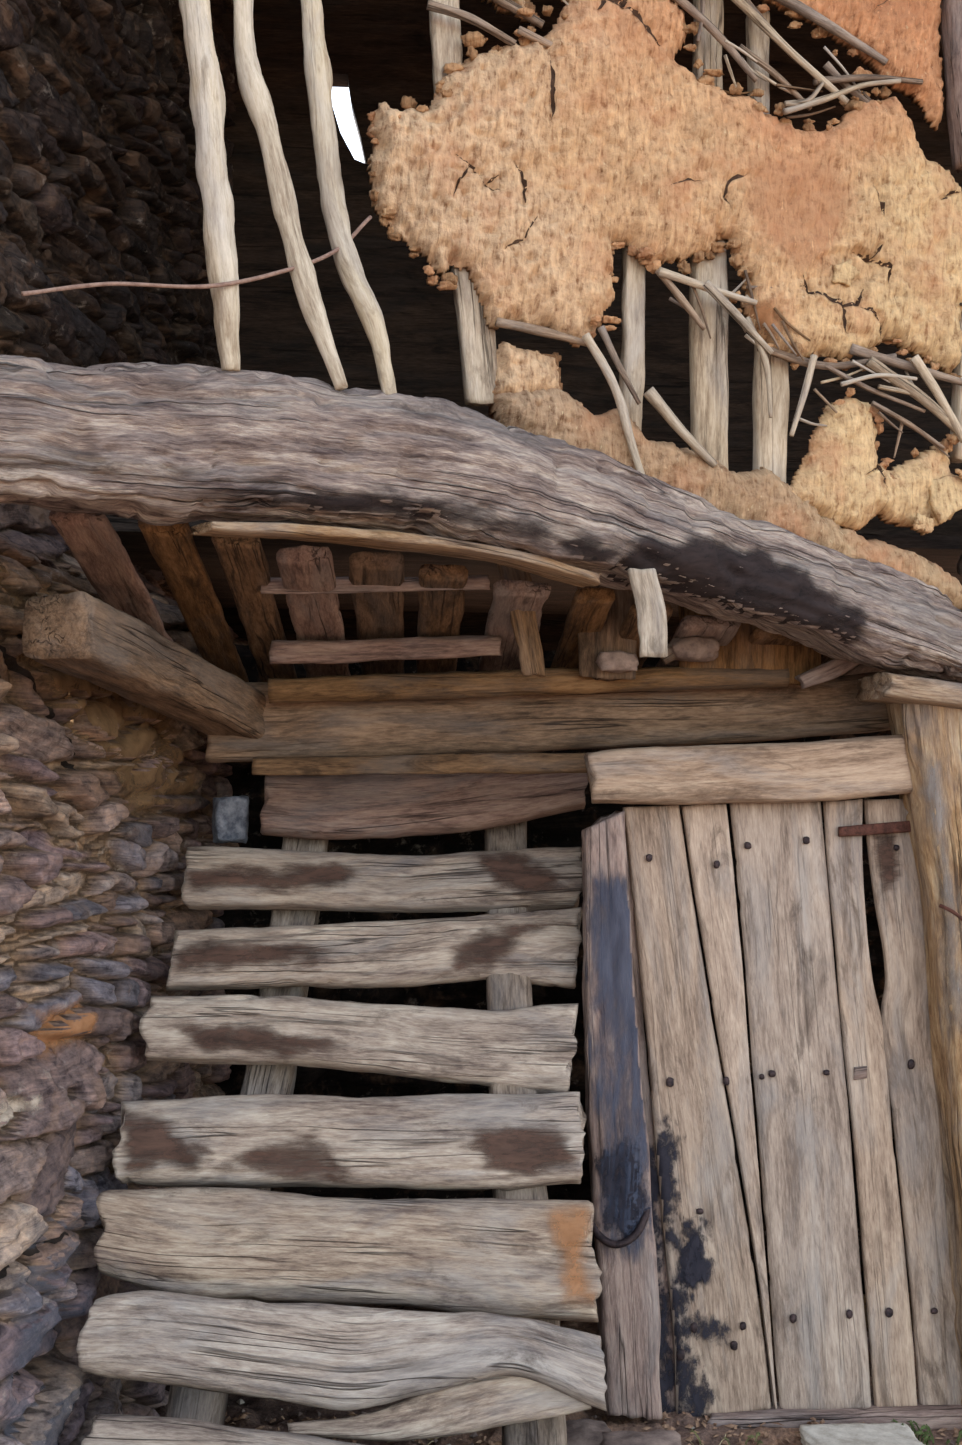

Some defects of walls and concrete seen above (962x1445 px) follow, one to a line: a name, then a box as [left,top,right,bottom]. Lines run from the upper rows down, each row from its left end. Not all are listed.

spalling [682,0,892,132]
crack [803,185,893,336]
spalling [590,315,621,338]
spalling [611,233,962,405]
spalling [869,406,897,479]
spalling [911,433,959,458]
peeling [913,469,962,534]
damp [585,874,729,1417]
damp [551,1209,589,1298]